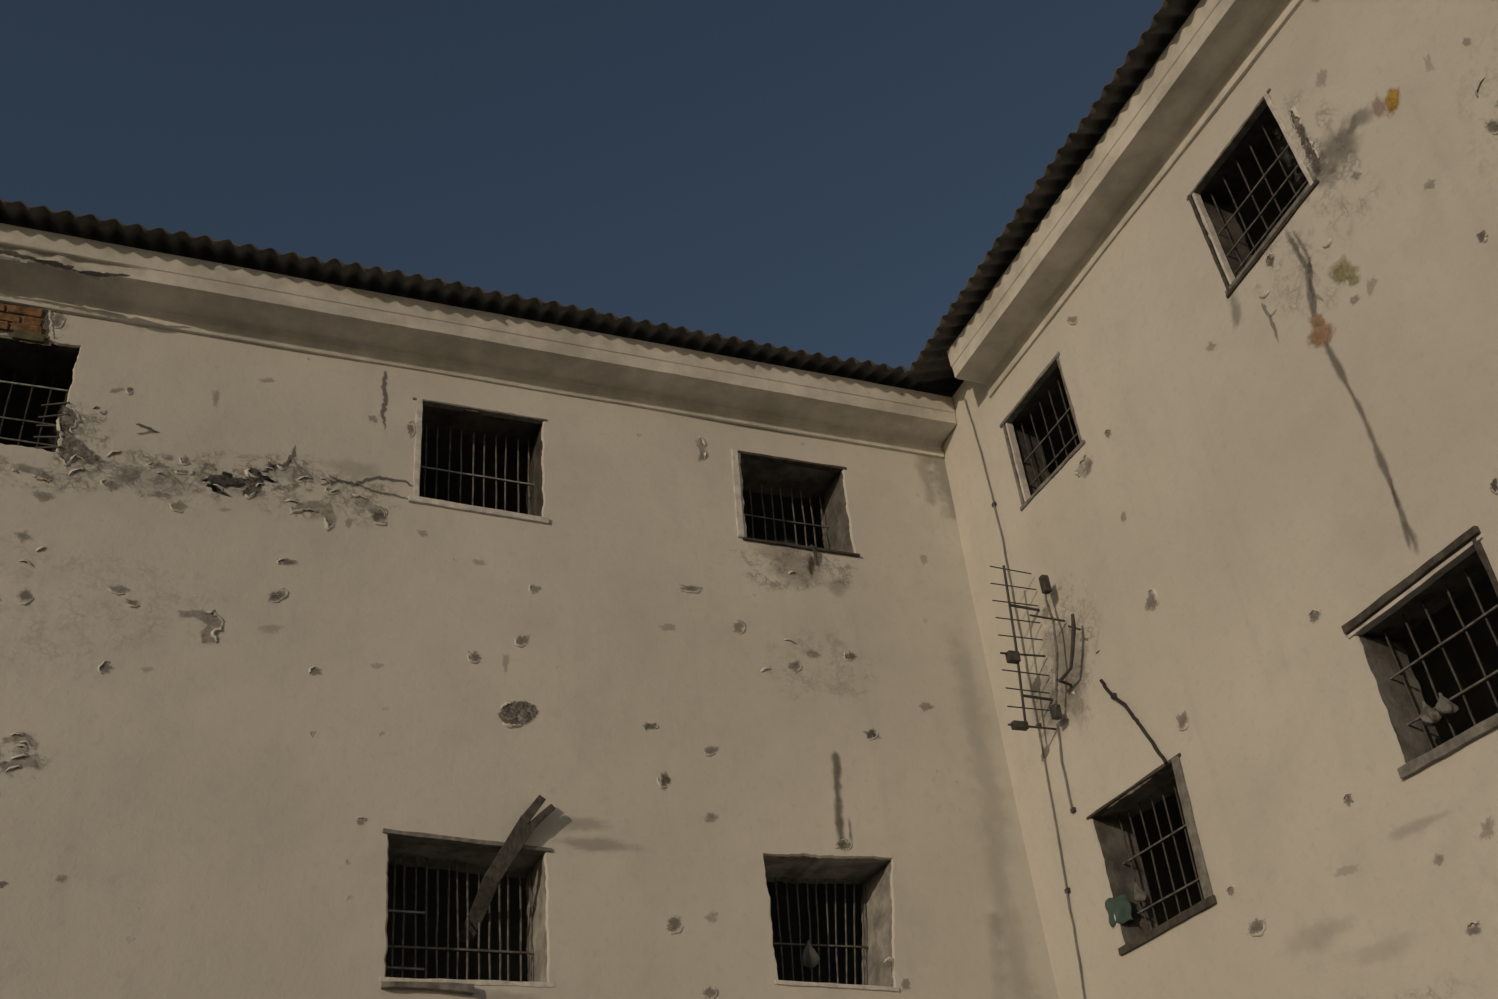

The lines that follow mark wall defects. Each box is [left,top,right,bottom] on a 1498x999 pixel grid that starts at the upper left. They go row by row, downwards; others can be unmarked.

corrosion [1373,89,1399,115]
flaking render [0,303,66,346]
corrosion [1310,314,1331,346]
crack [380,371,388,430]
spalling [11,405,121,491]
spalling [244,465,388,531]
spalling [499,700,538,729]